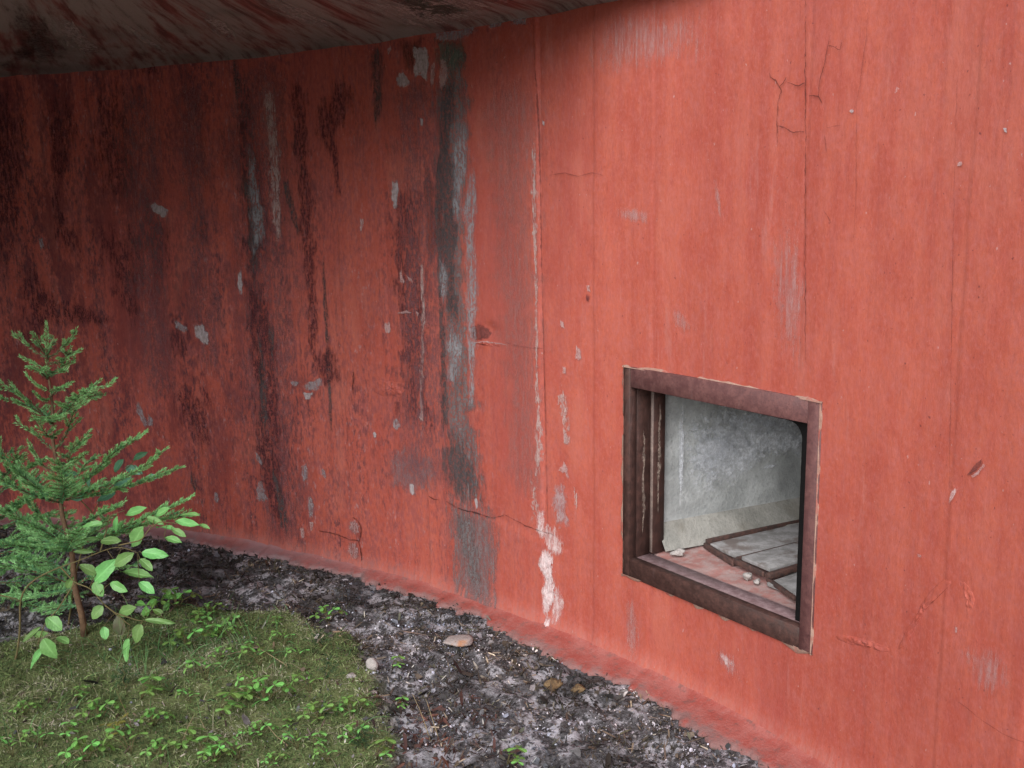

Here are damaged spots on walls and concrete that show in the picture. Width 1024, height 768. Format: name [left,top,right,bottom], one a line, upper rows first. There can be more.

damp [224,61,354,539]
spalling [396,47,447,87]
damp [389,39,499,608]
crack [429,496,550,534]
damp [530,143,577,627]
crack [770,0,841,360]